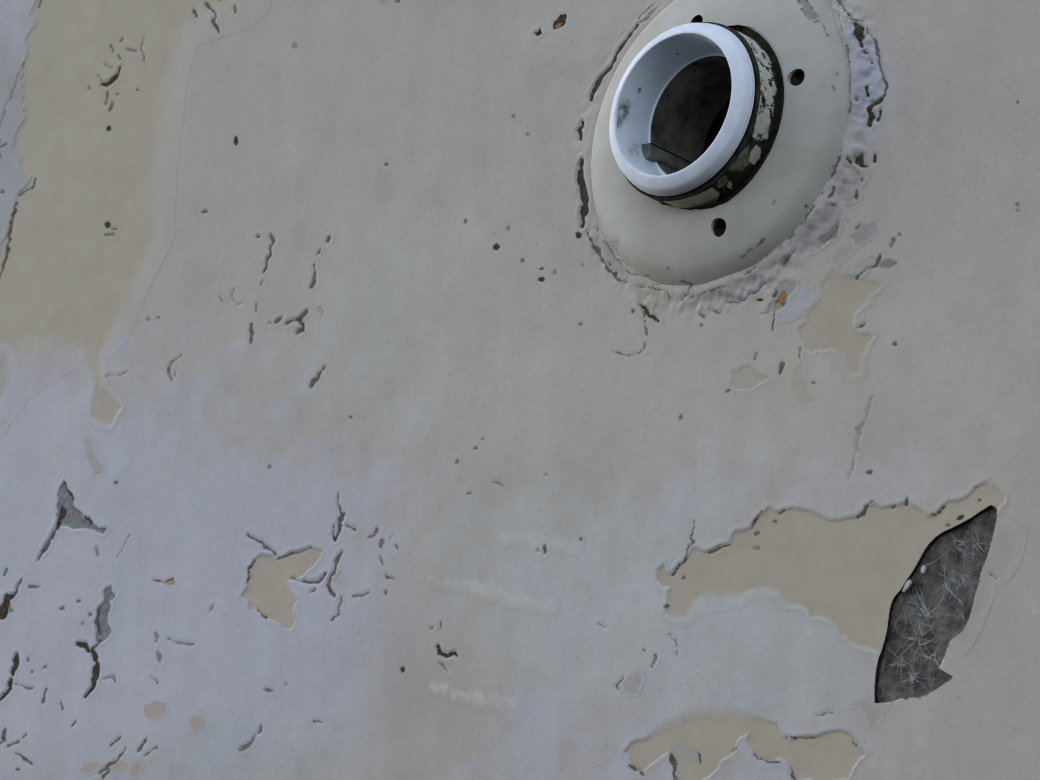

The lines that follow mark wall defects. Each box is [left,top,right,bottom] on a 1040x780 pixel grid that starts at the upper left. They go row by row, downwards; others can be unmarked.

peeling [664,31,777,210]
crack [0,526,57,620]
spalling [57,481,107,534]
crack [247,534,277,556]
peeling [239,545,323,631]
crack [292,495,398,621]
peeling [653,476,1027,703]
crack [0,653,76,727]
crack [0,728,33,771]
crack [99,737,158,779]
crack [239,727,262,750]
peeling [621,692,867,780]